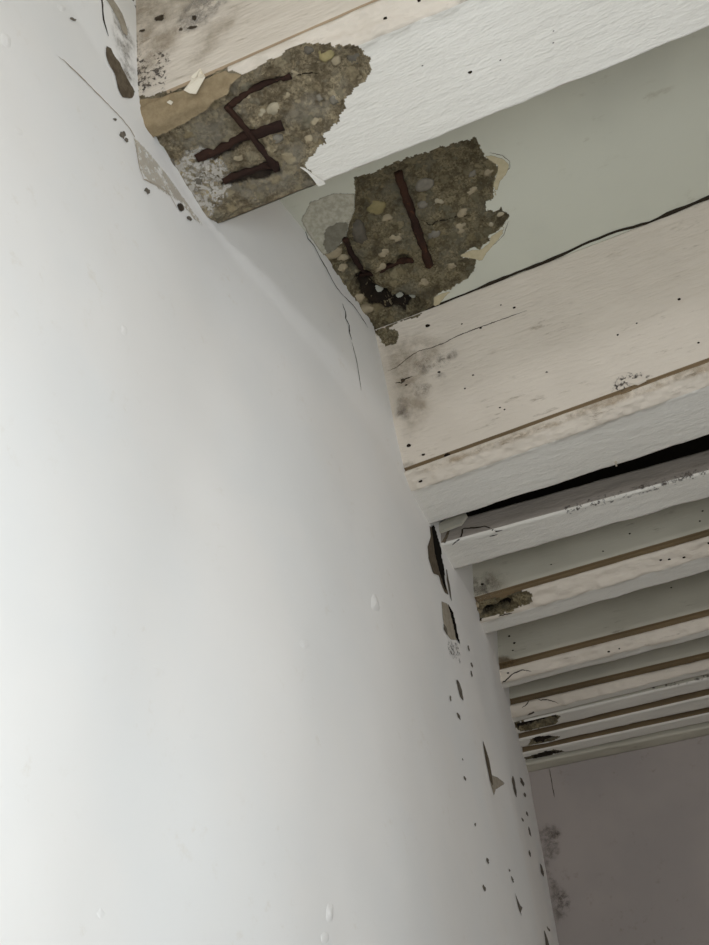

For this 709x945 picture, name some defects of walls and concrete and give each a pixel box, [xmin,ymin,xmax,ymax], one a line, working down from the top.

peeling [107,0,128,35]
leakage [179,0,207,31]
leakage [120,27,169,90]
spalling [106,42,510,346]
crack [425,195,709,311]
peeling [428,525,470,660]
spalling [475,591,533,621]
spalling [514,715,564,760]
peeling [483,742,526,797]